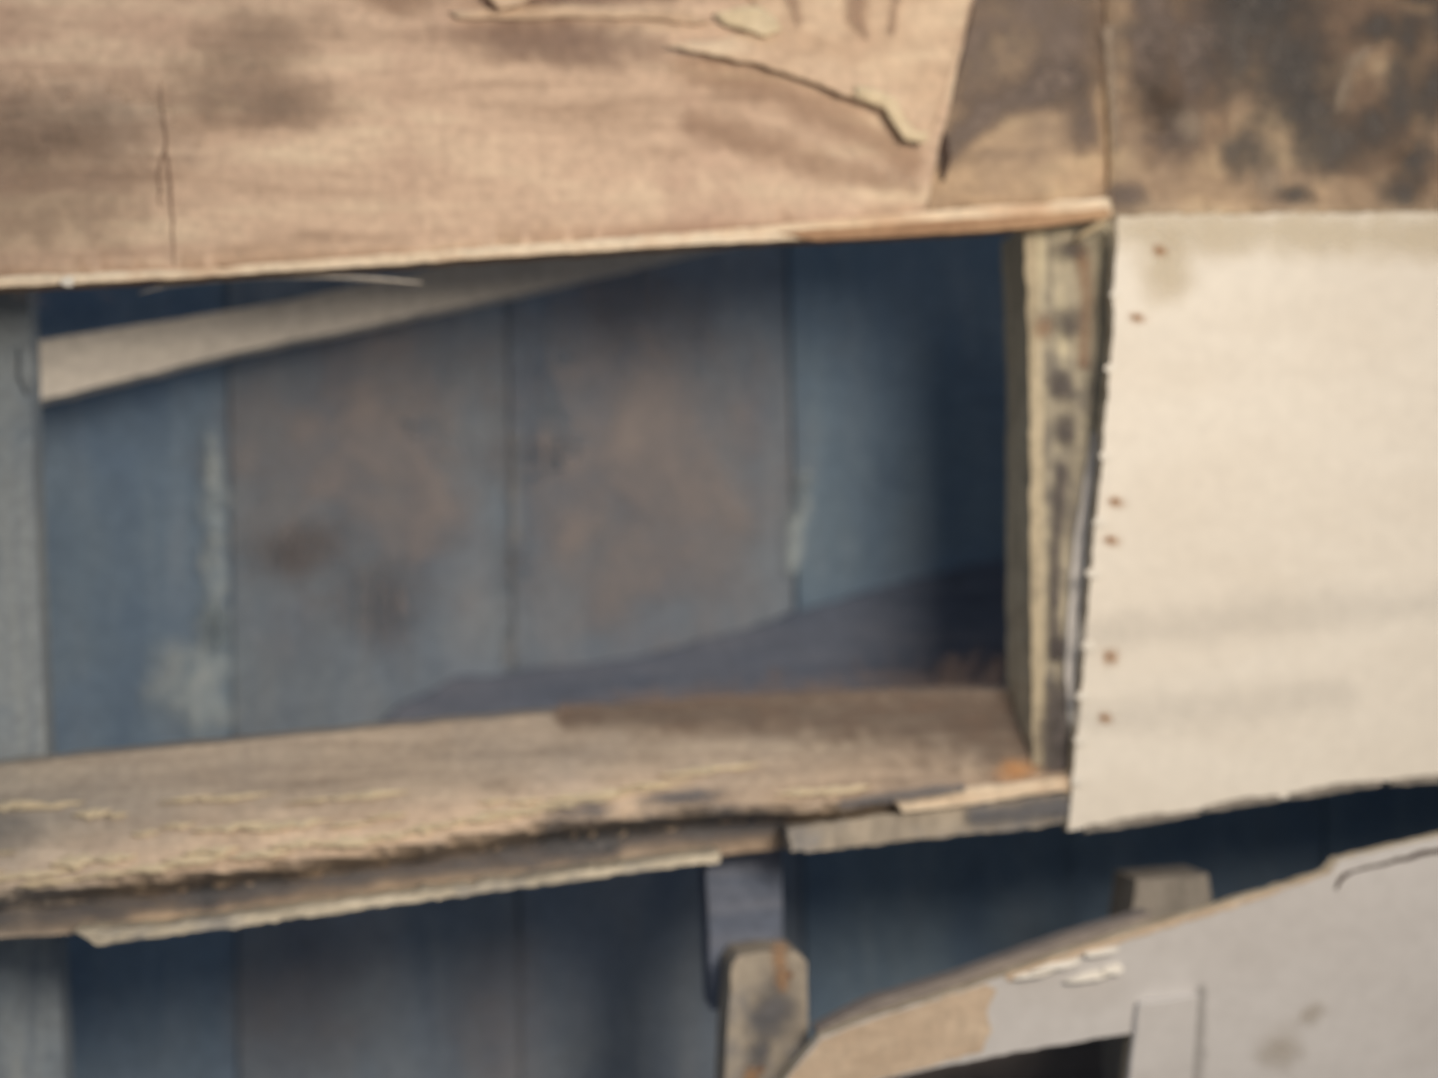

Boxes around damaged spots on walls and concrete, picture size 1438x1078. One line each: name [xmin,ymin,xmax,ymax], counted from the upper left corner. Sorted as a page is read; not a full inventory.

peeling [713,6,782,37]
peeling [855,85,930,143]
leakage [936,0,1438,206]
leakage [1058,417,1074,441]
leakage [1051,463,1067,658]
crack [1335,849,1438,890]
peeling [789,869,1338,1078]